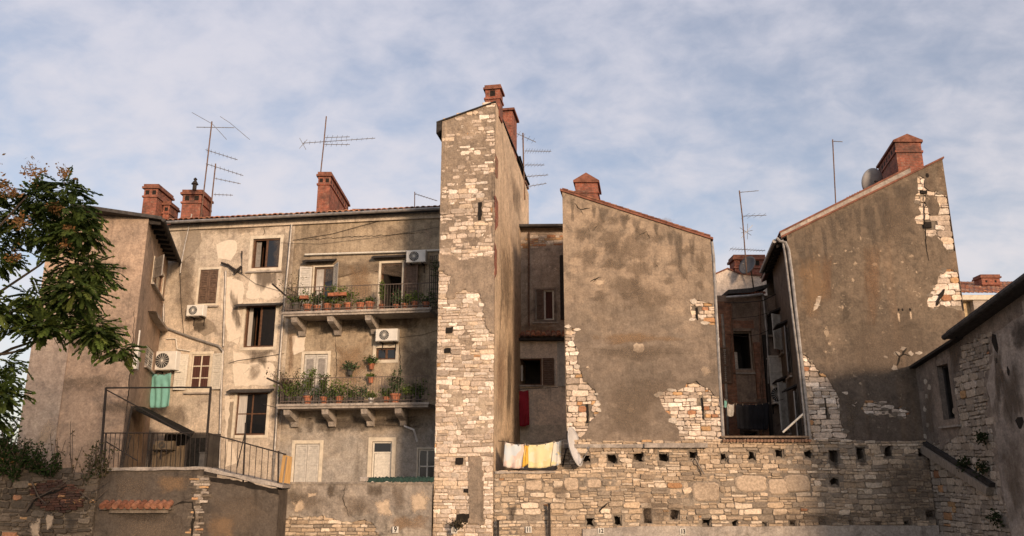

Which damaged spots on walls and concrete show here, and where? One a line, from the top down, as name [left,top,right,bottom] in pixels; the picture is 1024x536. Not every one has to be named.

flaking render [913,173,954,253]
flaking render [433,102,498,536]
flaking render [689,298,715,325]
flaking render [920,268,963,311]
peeling [182,272,283,536]
flaking render [565,324,601,440]
flaking render [654,381,722,442]
flaking render [801,332,1010,536]
flaking render [28,479,85,513]
flaking render [285,512,381,536]